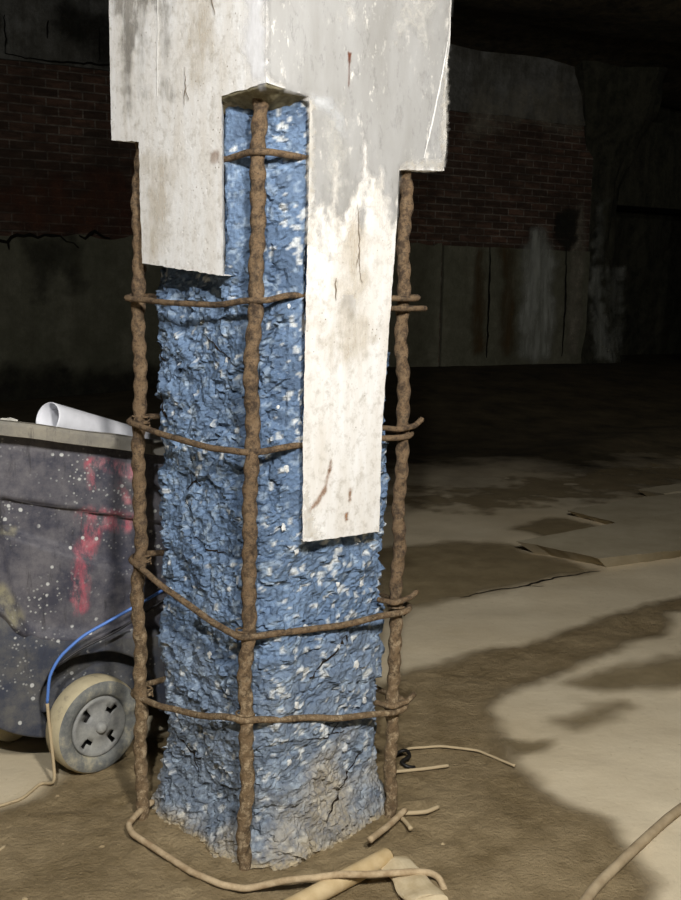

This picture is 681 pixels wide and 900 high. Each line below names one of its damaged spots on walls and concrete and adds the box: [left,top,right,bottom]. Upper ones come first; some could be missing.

spalling [151,106,254,864]
spalling [250,0,450,871]